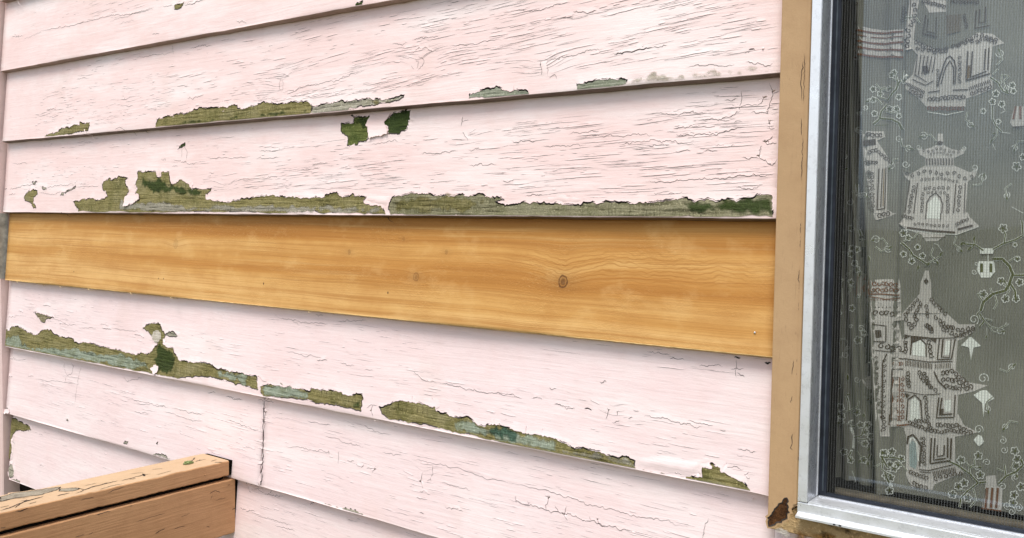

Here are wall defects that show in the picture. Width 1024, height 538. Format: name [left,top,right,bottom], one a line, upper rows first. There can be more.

peeling [46,117,92,136]
peeling [155,91,415,151]
crack [6,0,805,198]
peeling [468,82,529,98]
peeling [23,166,777,217]
peeling [5,308,644,470]
crack [644,346,797,403]
peeling [0,404,83,502]
crack [0,315,759,538]
peeling [686,458,750,490]